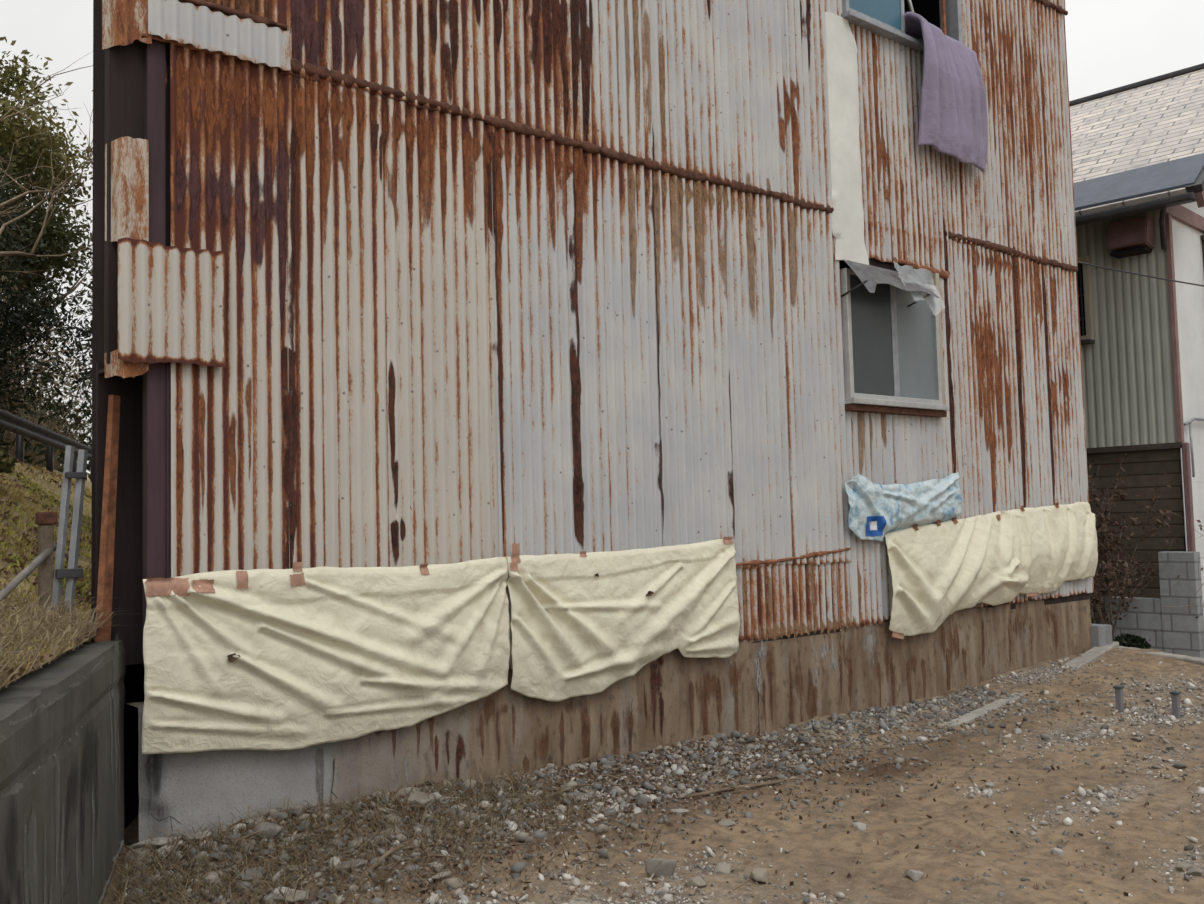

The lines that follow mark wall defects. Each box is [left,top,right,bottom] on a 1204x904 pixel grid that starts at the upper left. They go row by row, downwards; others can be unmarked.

corrosion [165,0,458,569]
corrosion [474,0,508,45]
corrosion [463,130,519,544]
corrosion [524,0,598,547]
corrosion [615,0,774,526]
corrosion [777,79,800,305]
corrosion [870,32,921,266]
corrosion [943,217,1072,512]
corrosion [971,0,1050,253]
corrosion [416,717,465,780]
corrosion [523,657,664,773]
corrosion [742,557,861,725]